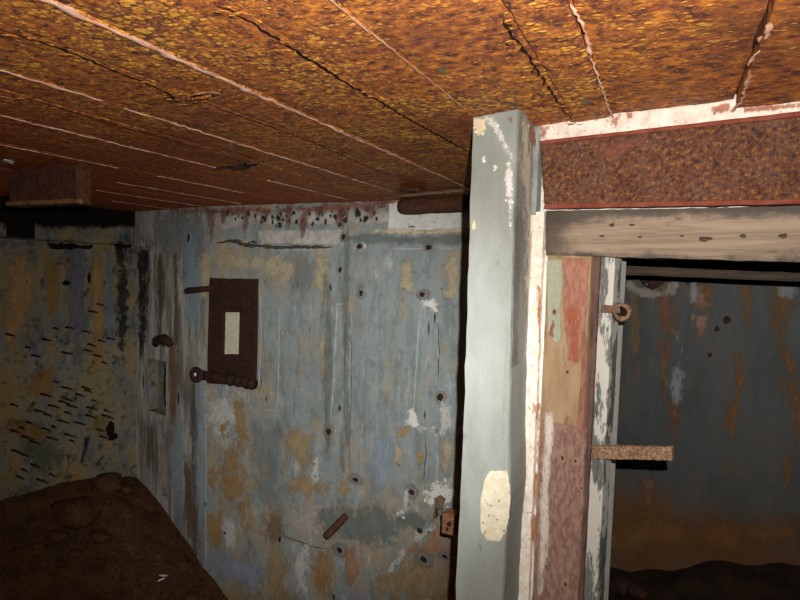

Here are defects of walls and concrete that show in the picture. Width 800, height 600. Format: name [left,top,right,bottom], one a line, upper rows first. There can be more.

crack [0,29,402,179]
crack [214,4,472,154]
rust [530,126,549,146]
crack [498,12,583,125]
leakage [0,241,150,368]
rust [173,188,428,240]
peeling [369,391,458,600]
peeling [473,111,533,360]
peeling [534,258,589,600]
rust [591,275,679,461]